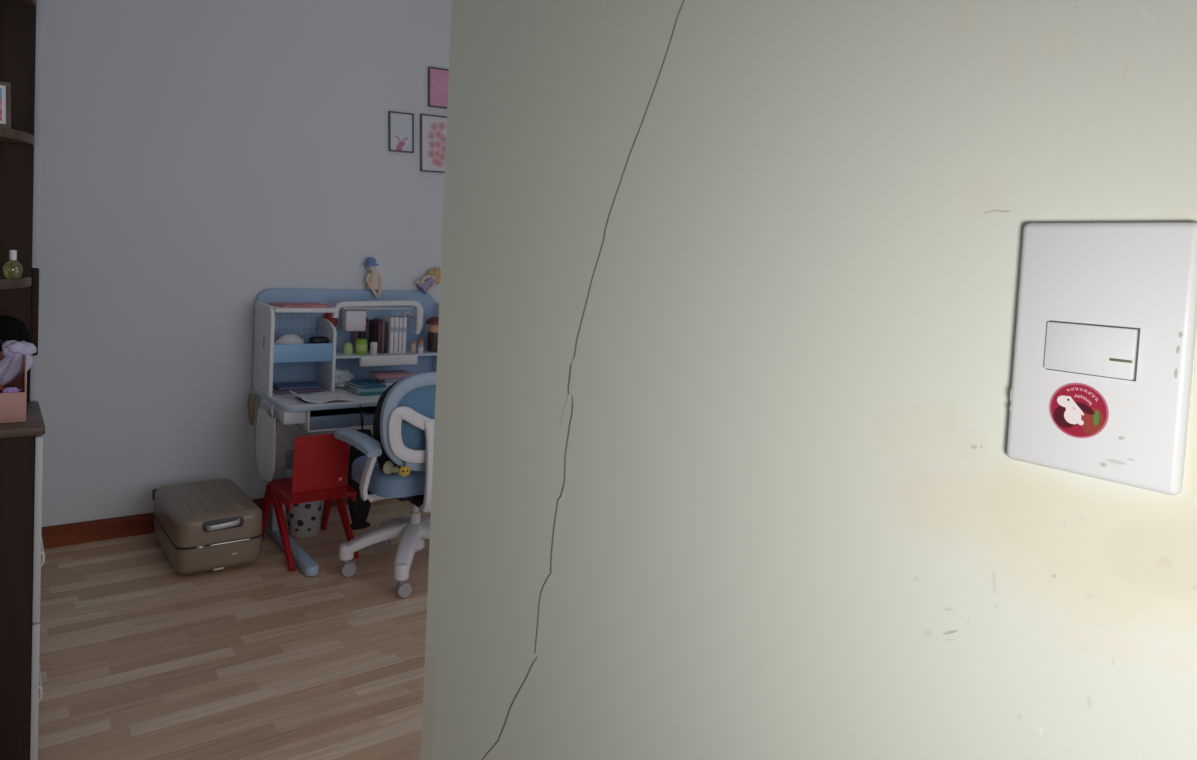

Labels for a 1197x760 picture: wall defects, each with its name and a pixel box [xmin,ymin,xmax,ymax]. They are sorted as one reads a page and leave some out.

crack [482,0,684,760]